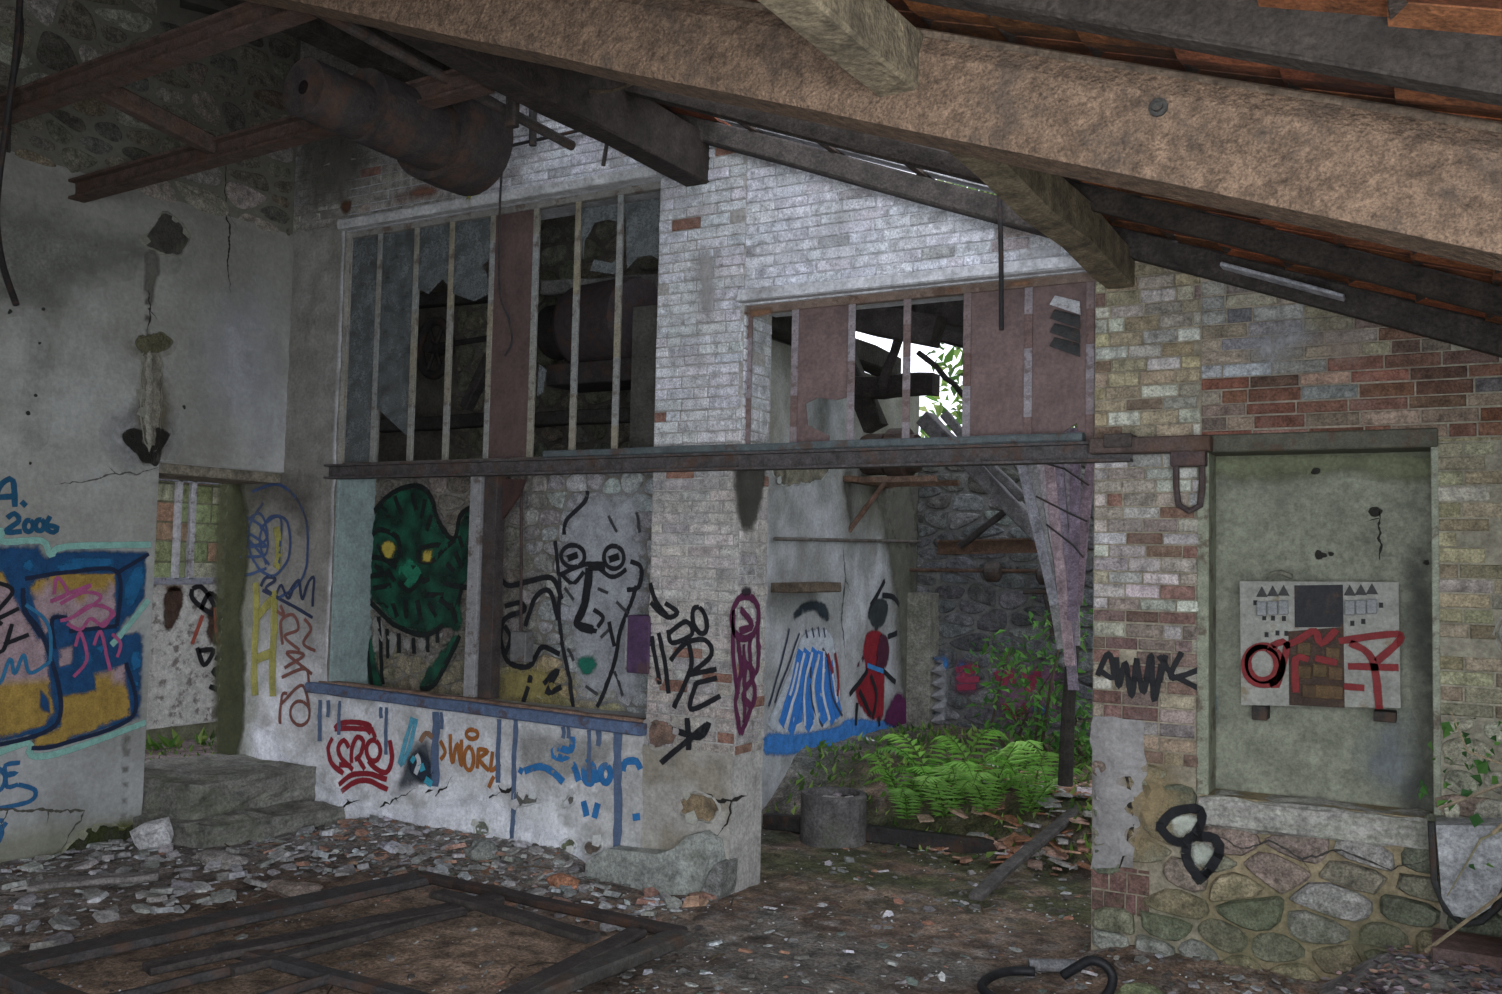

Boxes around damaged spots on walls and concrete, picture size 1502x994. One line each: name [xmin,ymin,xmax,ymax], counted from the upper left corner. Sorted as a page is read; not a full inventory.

crack [224,172,236,293]